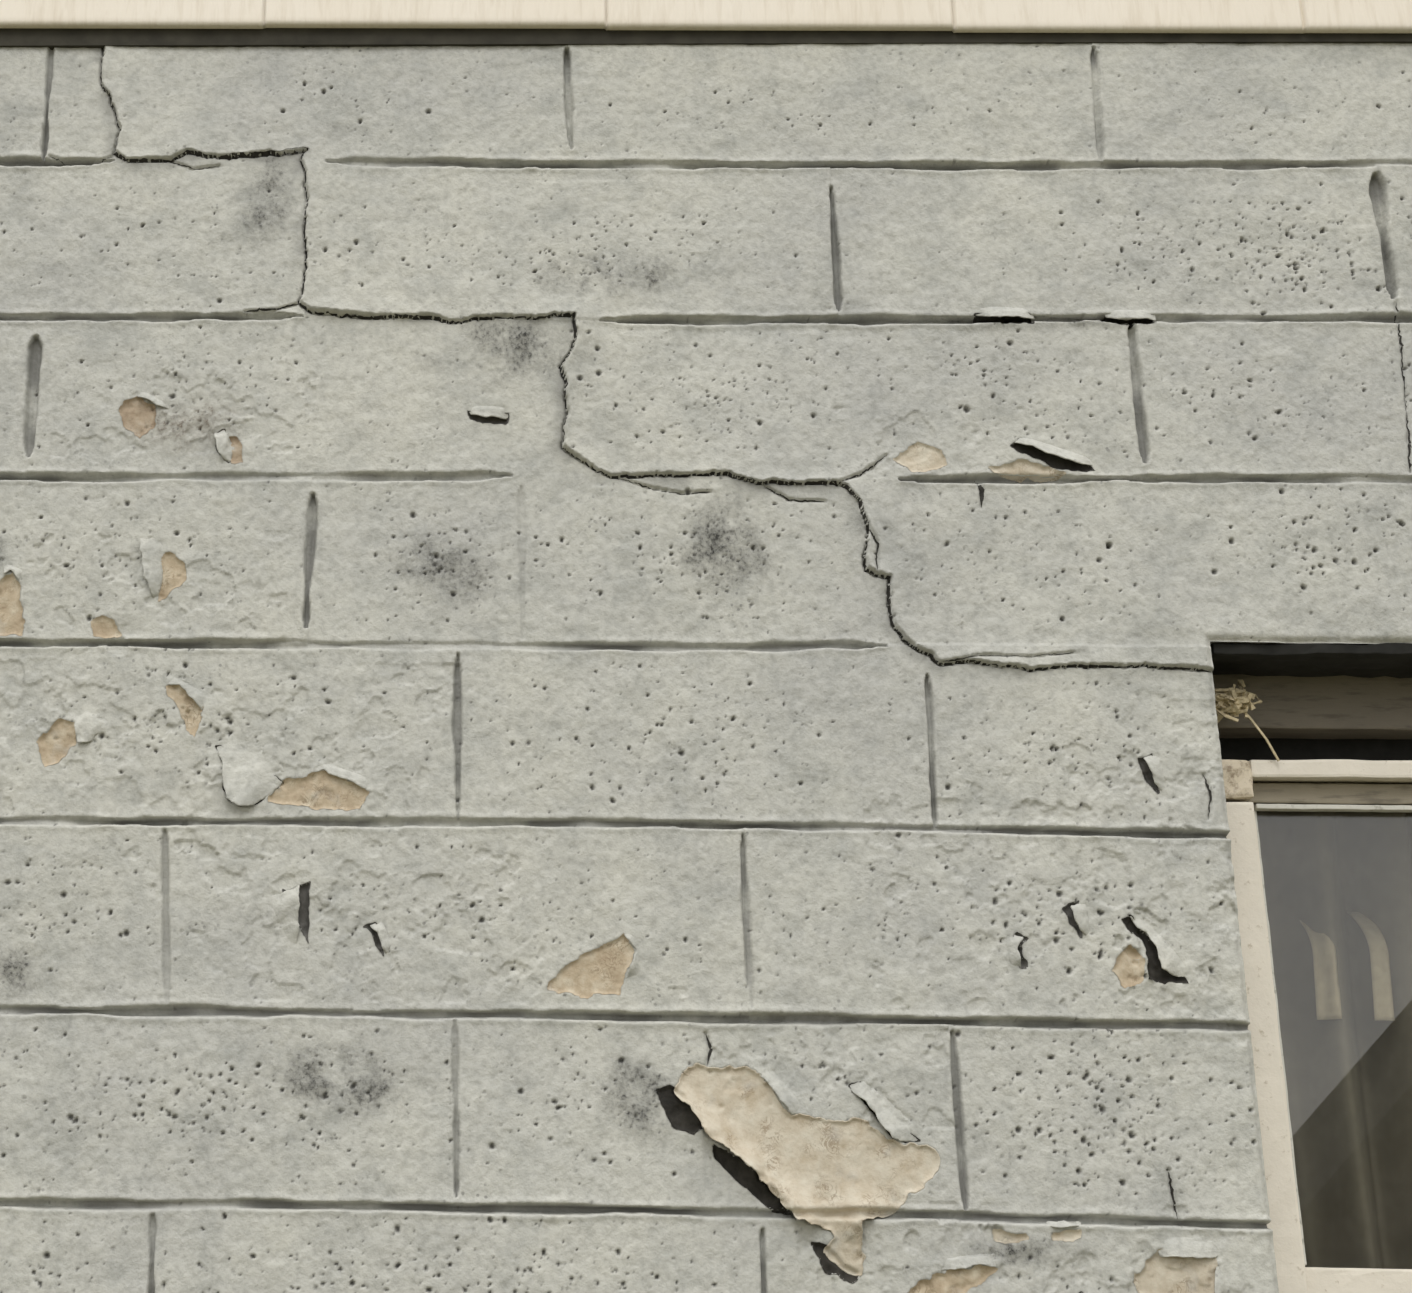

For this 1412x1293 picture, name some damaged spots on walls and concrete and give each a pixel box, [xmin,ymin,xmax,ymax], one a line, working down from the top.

crack [100,49,1209,672]
peeling [119,392,169,438]
peeling [988,438,1095,483]
peeling [166,672,205,737]
peeling [37,712,103,767]
peeling [215,743,369,811]
peeling [547,933,640,999]
peeling [1112,909,1189,988]
peeling [656,1063,940,1284]
peeling [908,1229,1029,1293]
peeling [1046,1220,1083,1242]
peeling [1134,1237,1225,1293]